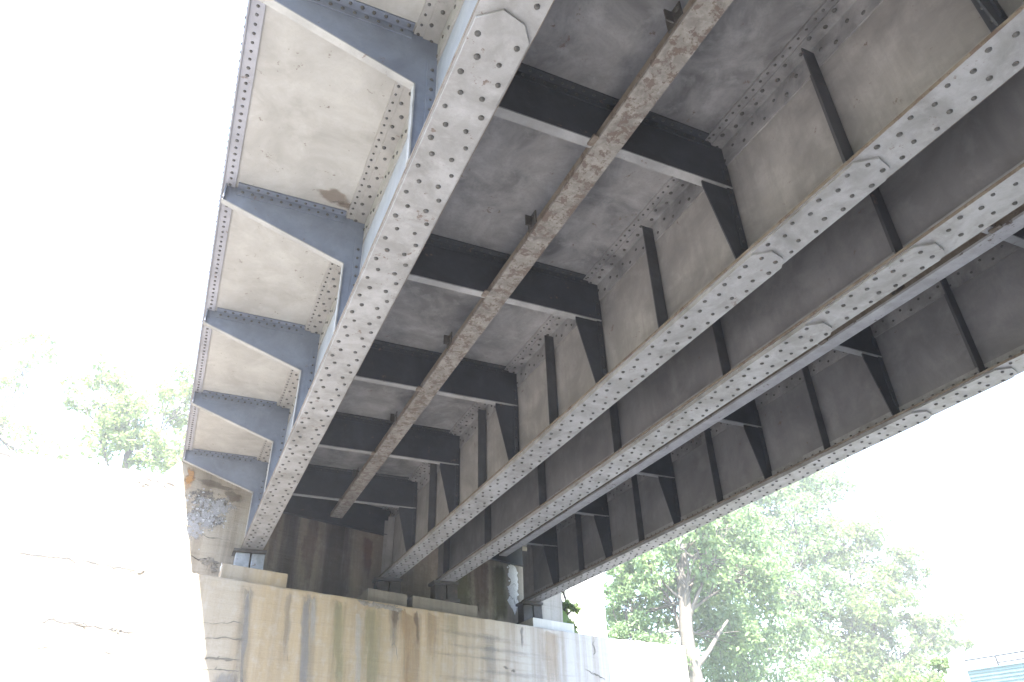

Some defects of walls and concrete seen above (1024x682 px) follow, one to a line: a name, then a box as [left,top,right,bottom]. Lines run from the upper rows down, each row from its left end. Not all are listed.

peeling [180,488,237,573]
leakage [494,567,506,620]